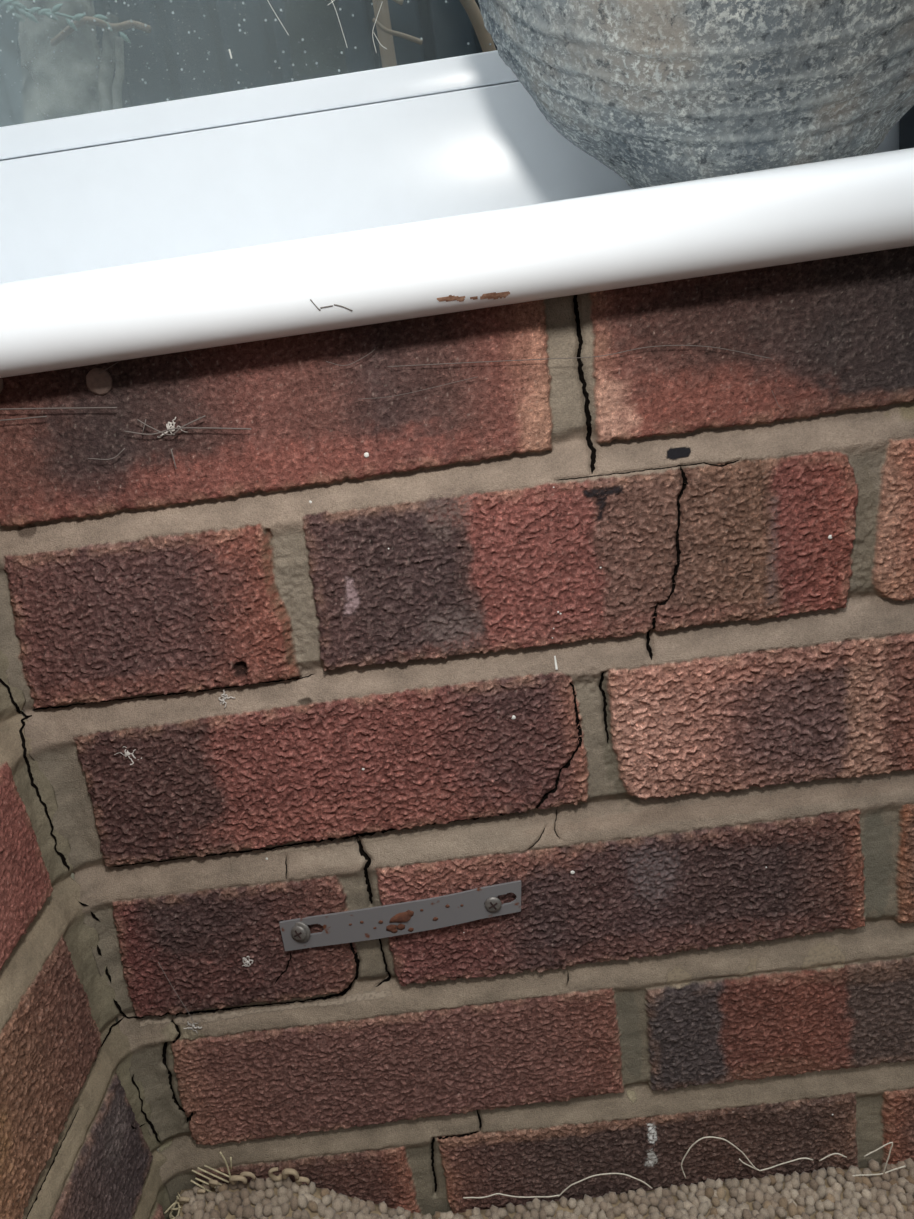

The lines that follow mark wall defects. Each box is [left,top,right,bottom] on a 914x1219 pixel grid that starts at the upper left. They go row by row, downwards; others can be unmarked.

crack [559,295,739,660]
crack [0,674,313,870]
crack [112,671,609,904]
crack [131,1074,161,1143]
crack [79,902,391,1123]
corrosion [349,904,463,933]
crack [431,1110,482,1192]